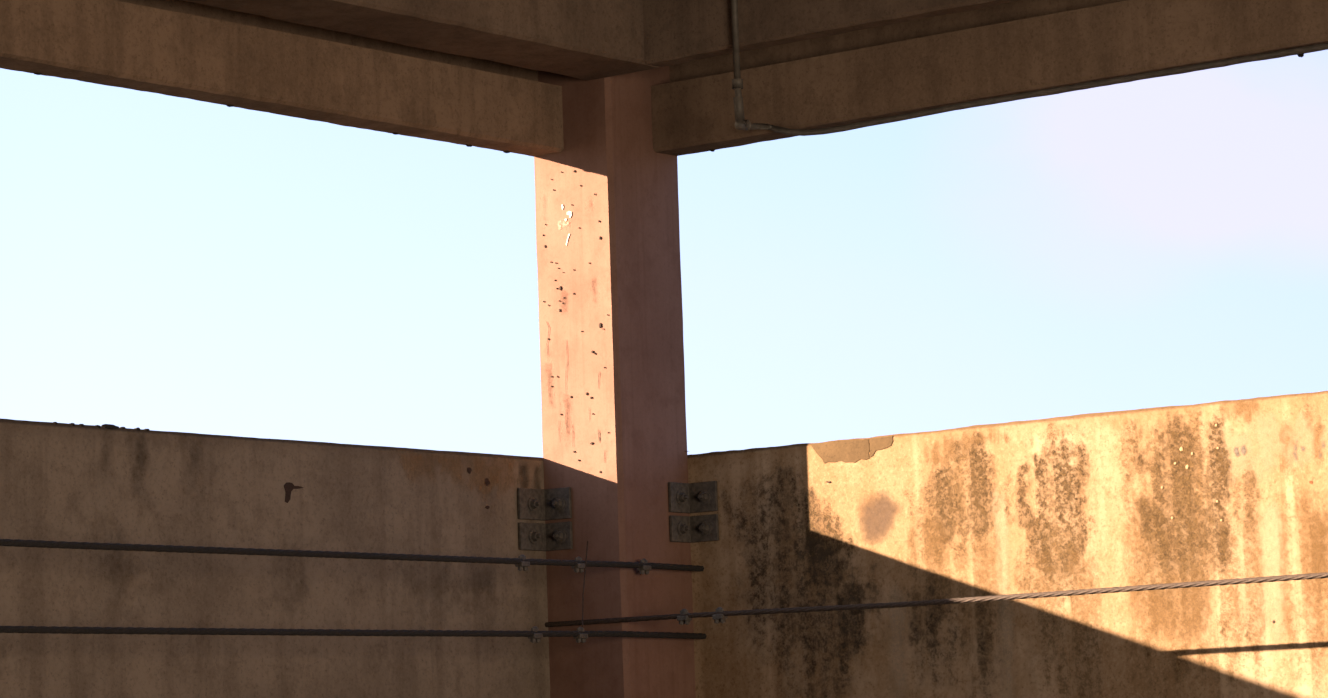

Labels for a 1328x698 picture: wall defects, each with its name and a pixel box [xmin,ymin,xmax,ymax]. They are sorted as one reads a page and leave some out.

peeling [810,436,893,464]
leakage [726,423,1100,698]
leakage [1121,408,1326,680]